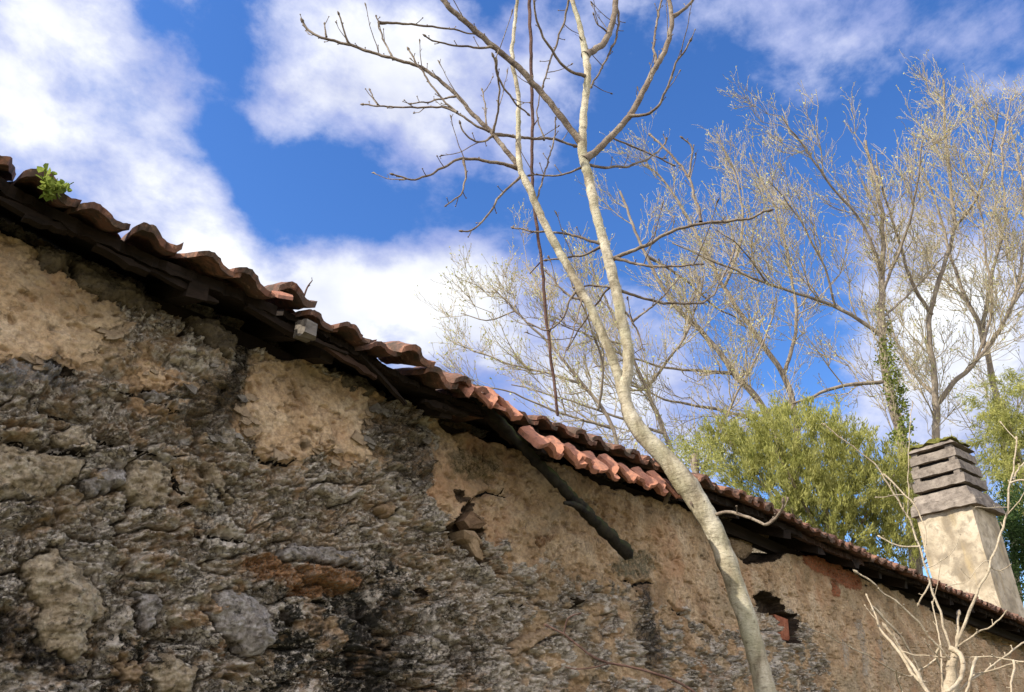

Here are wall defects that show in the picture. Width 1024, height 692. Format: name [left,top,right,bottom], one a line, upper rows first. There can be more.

flaking render [133,359,438,492]
crack [471,488,505,501]
spalling [444,489,492,567]
spalling [413,587,431,598]
damp [634,621,667,665]
spalling [753,590,804,644]